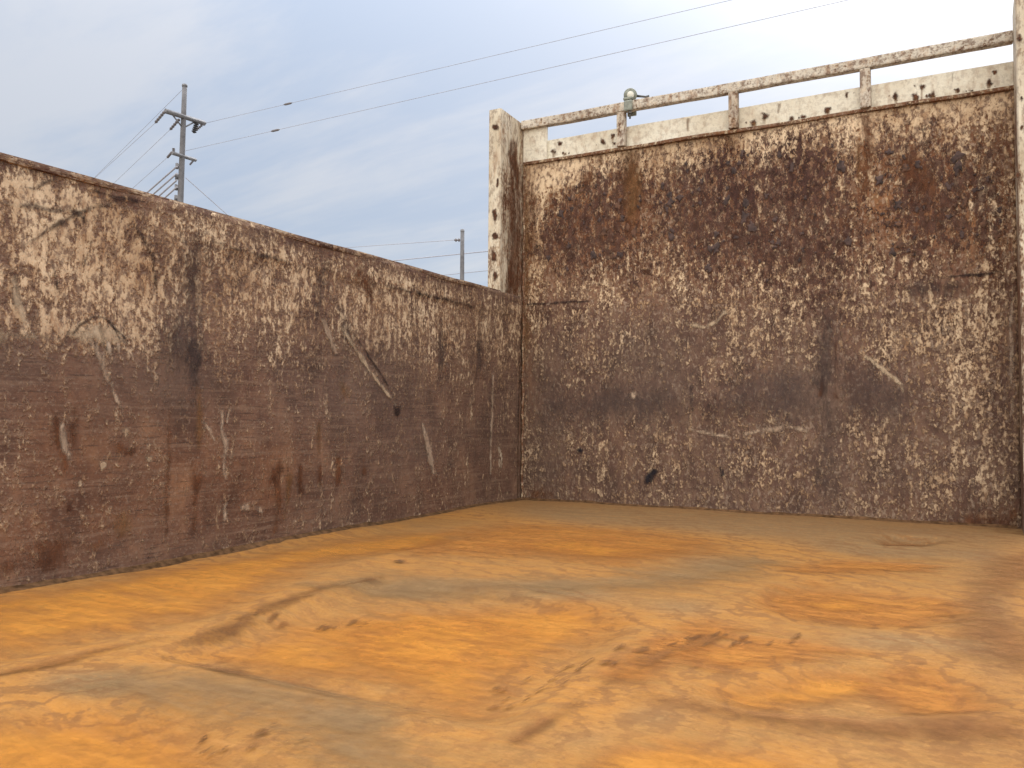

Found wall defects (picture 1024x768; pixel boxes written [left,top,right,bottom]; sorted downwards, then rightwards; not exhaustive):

corrosion [492,107,1020,322]
peeling [70,325,122,357]